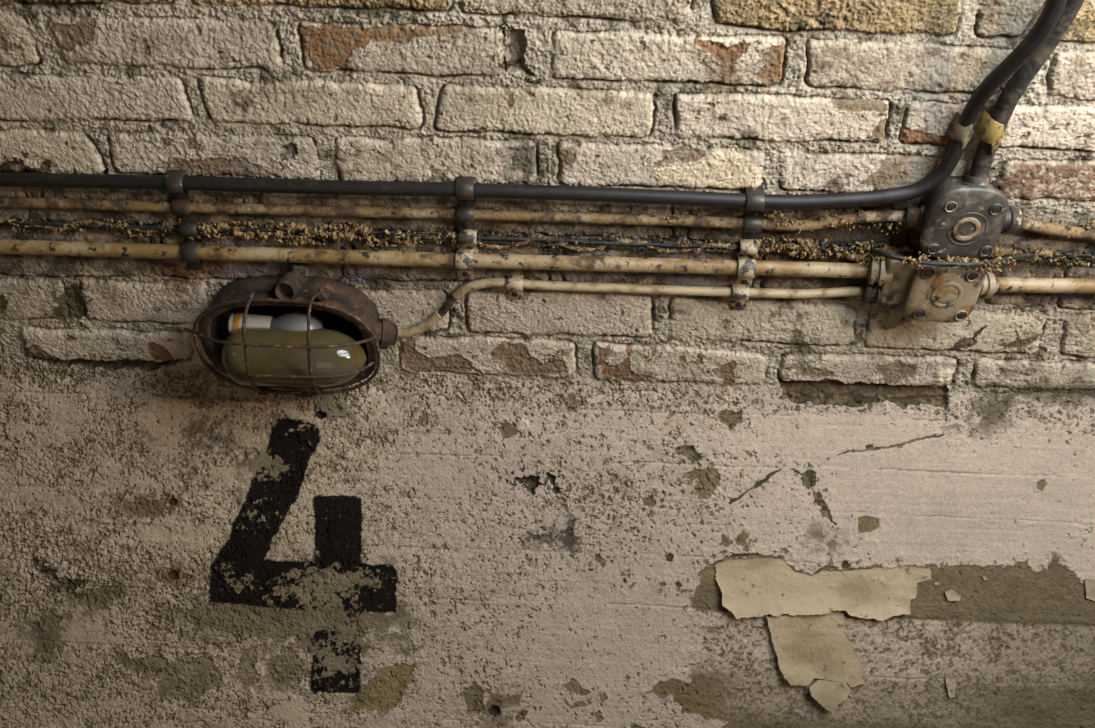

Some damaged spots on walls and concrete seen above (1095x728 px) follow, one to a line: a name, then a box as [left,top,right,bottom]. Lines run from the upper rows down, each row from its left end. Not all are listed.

peeling [290,14,472,80]
peeling [400,337,573,381]
peeling [592,335,751,430]
spalling [771,354,971,437]
spalling [510,468,571,501]
crack [728,432,950,526]
peeling [580,553,607,578]
peeling [643,525,1095,728]